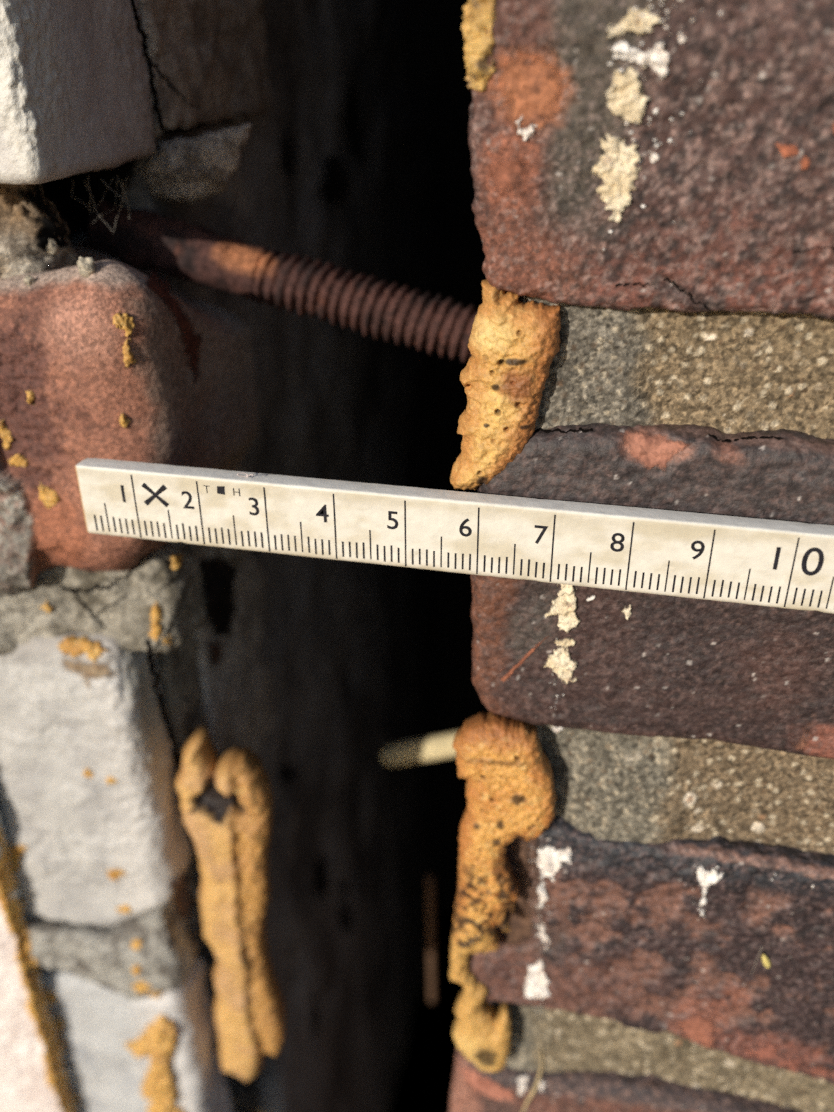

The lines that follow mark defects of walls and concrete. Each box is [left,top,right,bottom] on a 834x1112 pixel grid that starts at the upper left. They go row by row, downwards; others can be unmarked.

crack [130,0,249,135]
corrosion [147,269,202,383]
crack [61,549,154,628]
crack [143,622,182,766]